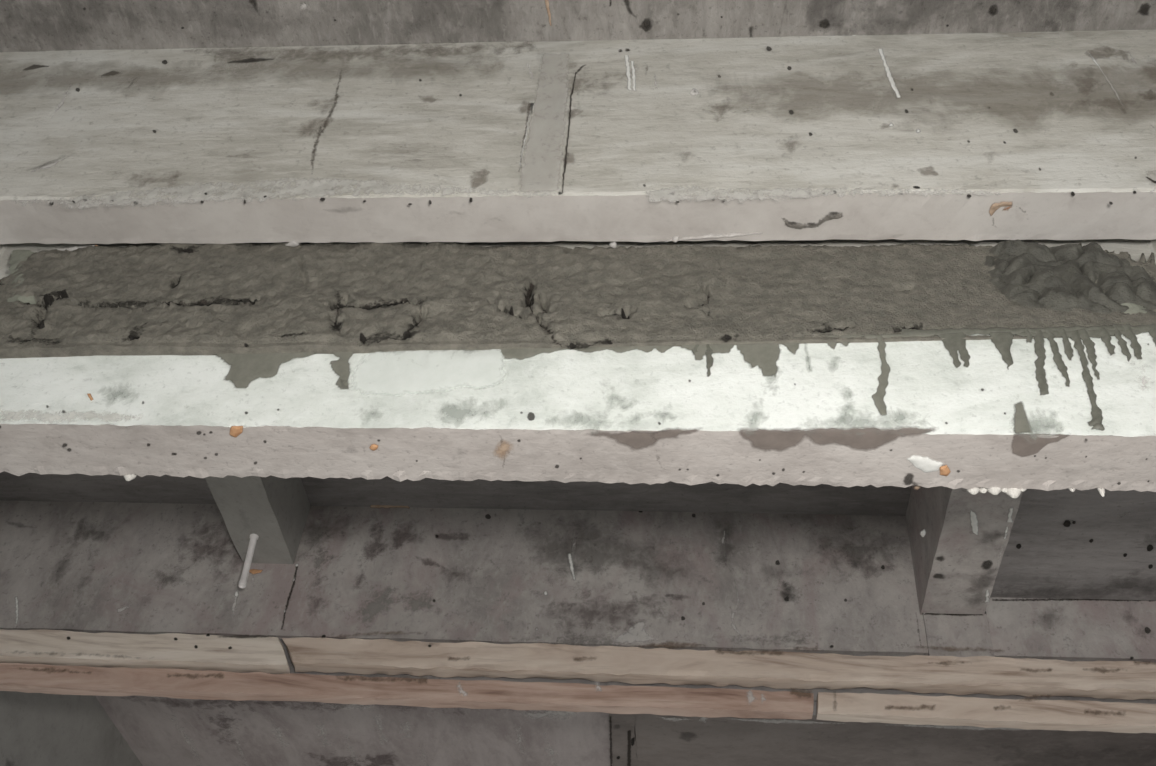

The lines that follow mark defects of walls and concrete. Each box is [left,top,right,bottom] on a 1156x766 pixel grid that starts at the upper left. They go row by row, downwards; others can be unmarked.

crack [311,77,341,164]
crack [558,65,585,195]
crack [526,284,561,345]
leakage [0,239,1156,457]